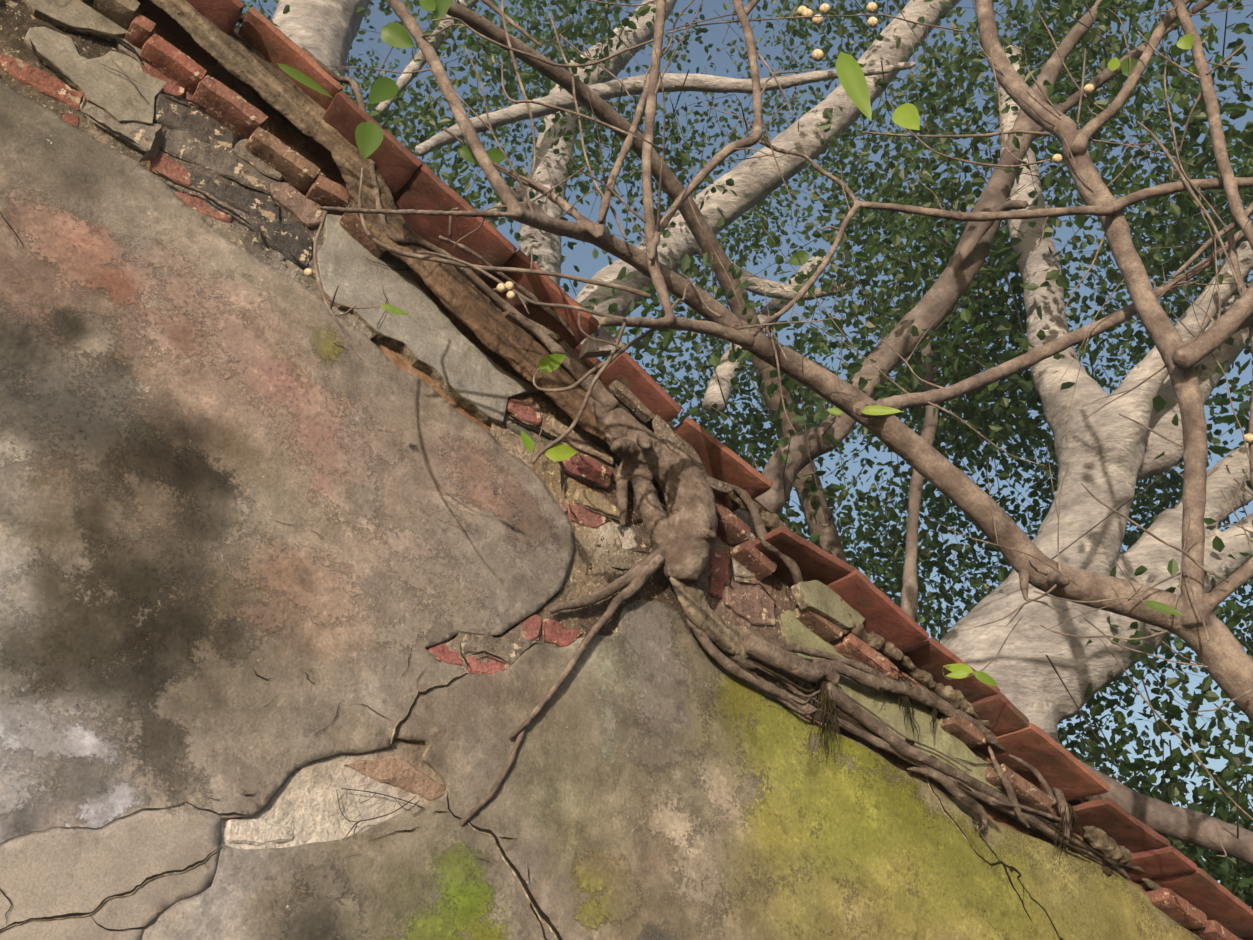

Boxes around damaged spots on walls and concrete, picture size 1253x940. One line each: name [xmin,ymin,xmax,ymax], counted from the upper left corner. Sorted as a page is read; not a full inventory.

spalling [0,0,375,339]
spalling [578,317,625,359]
water stain [0,185,499,834]
water stain [416,431,560,567]
spalling [426,380,734,674]
spalling [697,508,865,644]
crack [313,644,467,744]
spalling [749,658,817,698]
crack [0,845,222,932]
crack [0,789,260,844]
spalling [221,739,446,849]
crack [345,792,563,940]